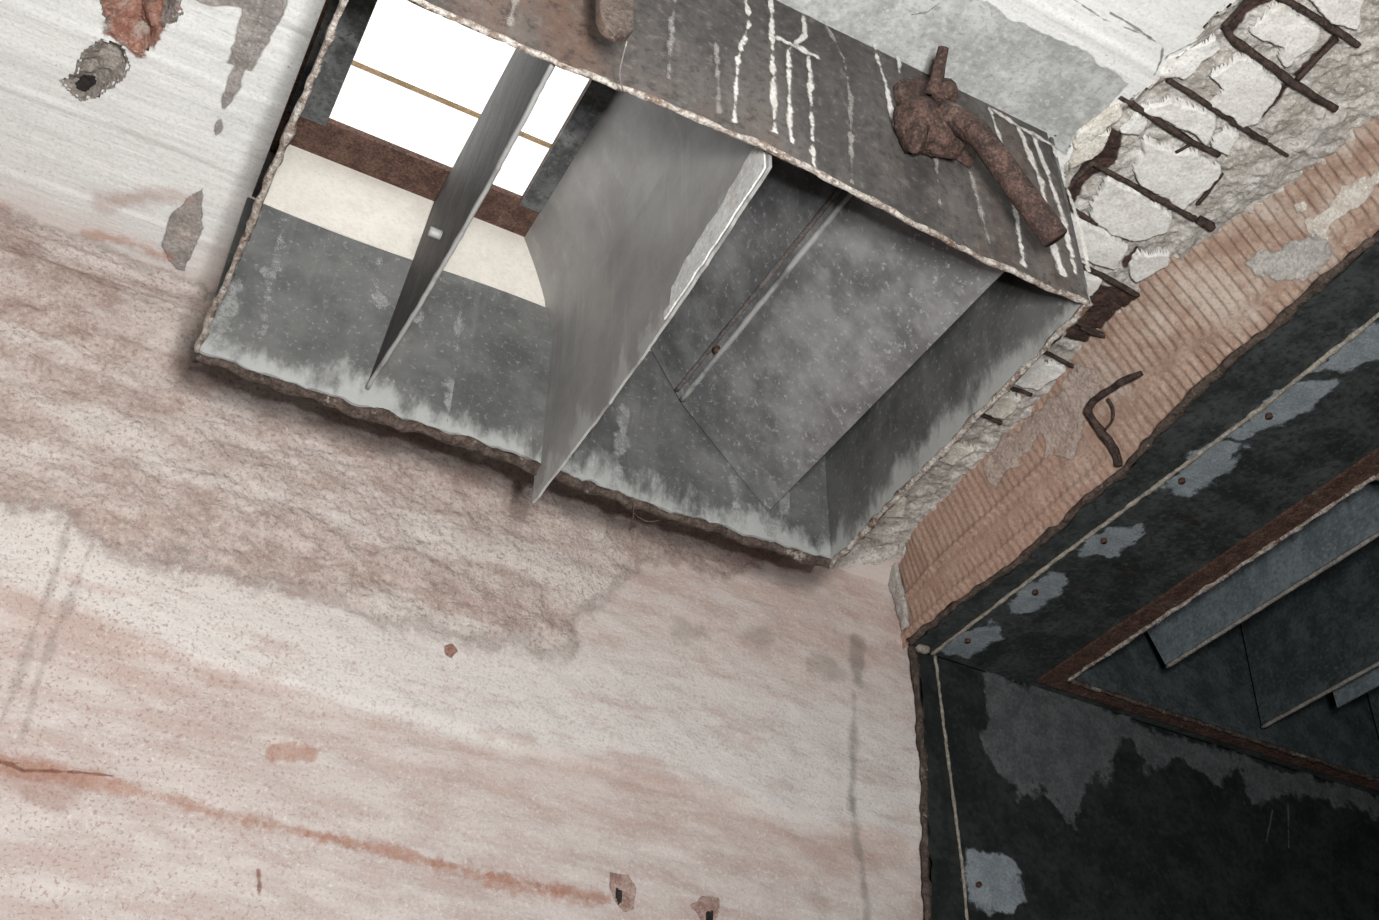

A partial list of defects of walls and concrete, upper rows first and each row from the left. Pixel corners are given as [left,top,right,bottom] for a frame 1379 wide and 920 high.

spalling [59,0,287,135]
peeling [664,146,766,320]
spalling [777,0,1379,569]